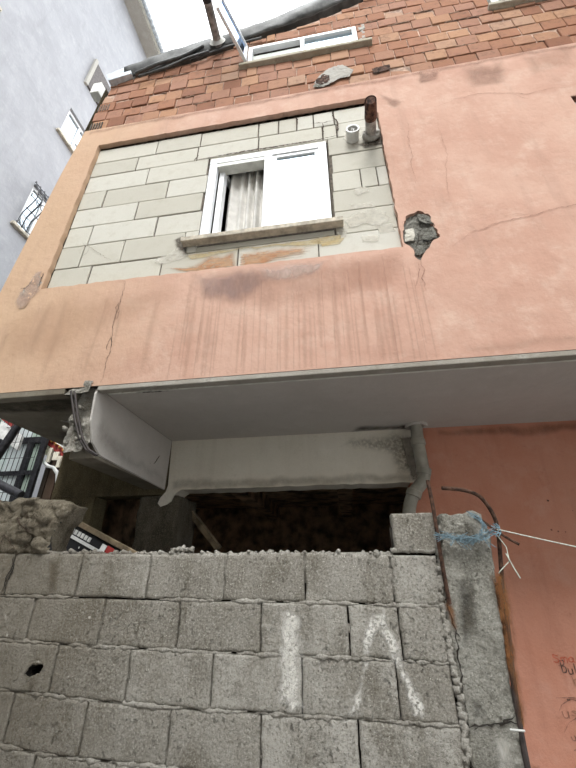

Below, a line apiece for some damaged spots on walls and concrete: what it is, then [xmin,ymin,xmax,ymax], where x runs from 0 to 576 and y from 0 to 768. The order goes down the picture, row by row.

flaking render [17,272,44,309]
rust [175,249,302,271]
spalling [403,213,439,260]
crack [103,284,125,376]
spalling [62,380,99,456]
crack [444,590,517,731]